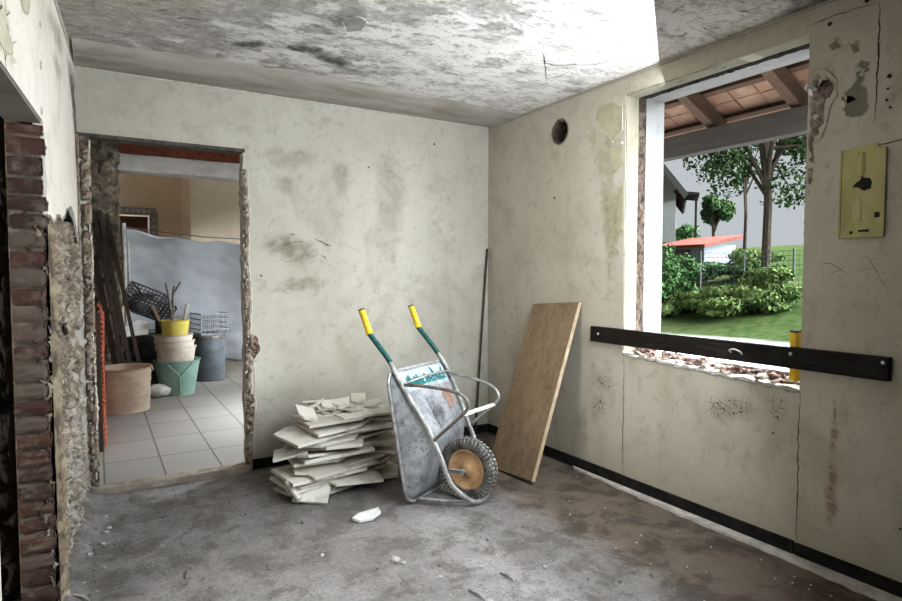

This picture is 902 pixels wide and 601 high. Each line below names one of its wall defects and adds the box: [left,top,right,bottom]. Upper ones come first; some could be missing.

peeling [20,0,31,15]
damp [286,45,345,66]
spalling [634,43,810,331]
spalling [804,36,870,194]
spalling [0,116,21,601]
spalling [23,133,100,601]
spalling [622,347,800,393]